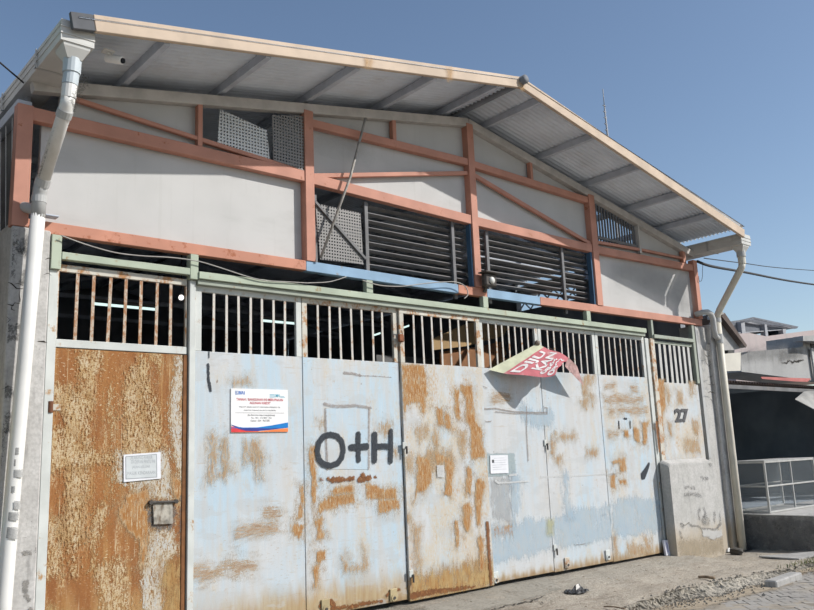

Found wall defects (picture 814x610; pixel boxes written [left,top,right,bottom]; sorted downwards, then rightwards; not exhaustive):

rust [205,430,234,486]
rust [242,437,267,482]
rust [394,363,513,600]
rust [609,457,627,491]
rust [580,374,695,453]
rust [683,420,701,455]
rust [119,487,151,570]
rust [234,506,282,539]
rust [290,444,400,589]
rust [156,556,180,610]
rust [193,560,257,583]
rust [319,588,400,610]